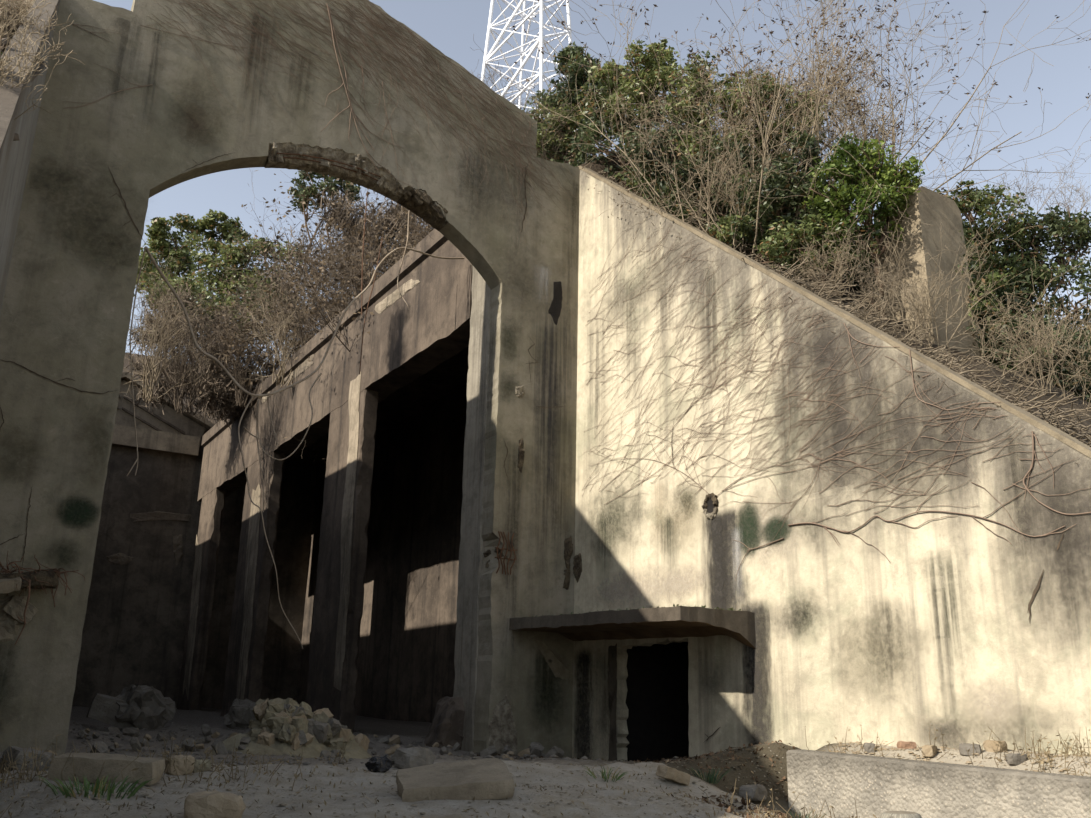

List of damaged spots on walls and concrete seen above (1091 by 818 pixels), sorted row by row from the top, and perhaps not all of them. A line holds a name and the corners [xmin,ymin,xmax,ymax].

spalling [265,142,448,231]
crack [2,360,119,394]
water stain [706,511,771,745]
water stain [574,652,592,760]